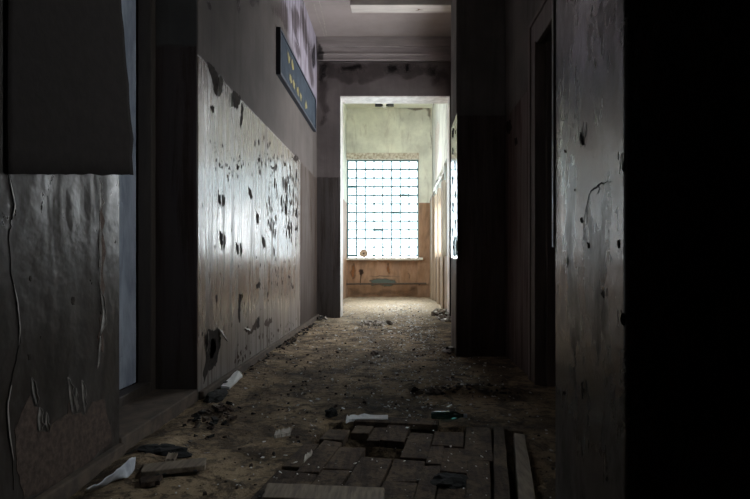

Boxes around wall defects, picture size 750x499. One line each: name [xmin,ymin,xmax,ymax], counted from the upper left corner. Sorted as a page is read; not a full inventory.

peeling [207,62,244,128]
leakage [275,4,445,124]
crack [3,5,21,490]
peeling [7,0,134,369]
peeling [210,140,299,256]
crack [583,181,611,240]
peeling [202,327,229,382]
peeling [231,293,297,342]